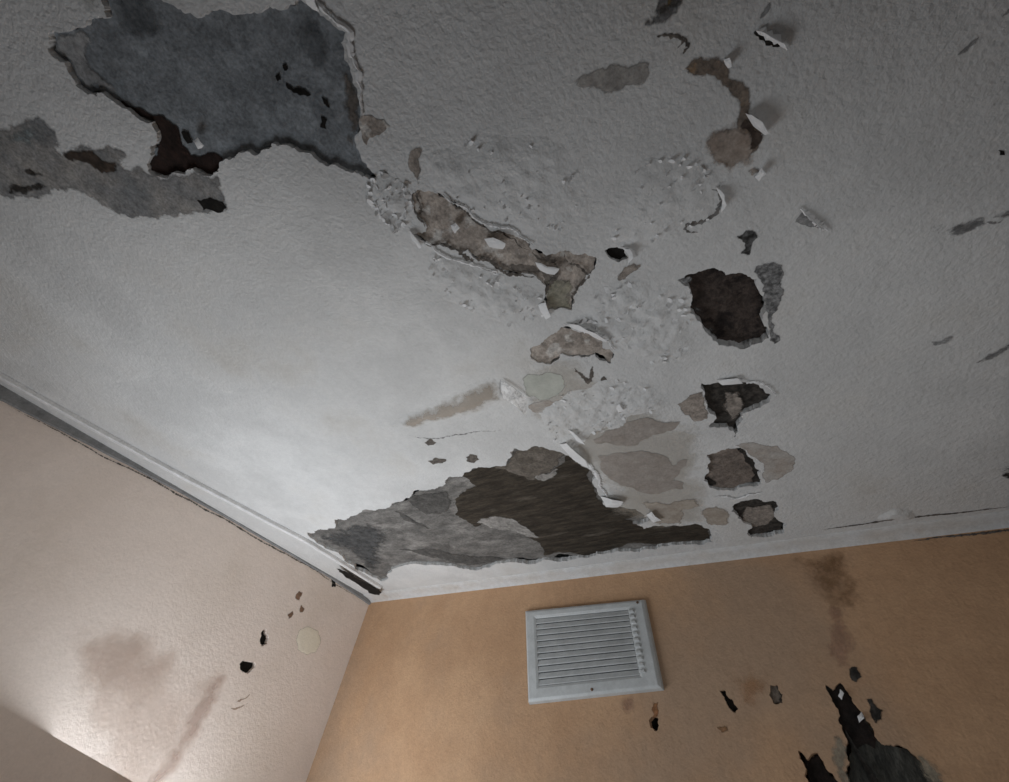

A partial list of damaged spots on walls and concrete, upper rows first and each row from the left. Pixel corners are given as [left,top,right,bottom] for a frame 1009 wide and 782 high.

spalling [0,0,390,219]
peeling [577,63,649,93]
peeling [686,57,769,181]
peeling [404,148,595,319]
spalling [678,262,784,344]
peeling [737,230,757,255]
peeling [501,323,615,417]
spalling [311,378,795,579]